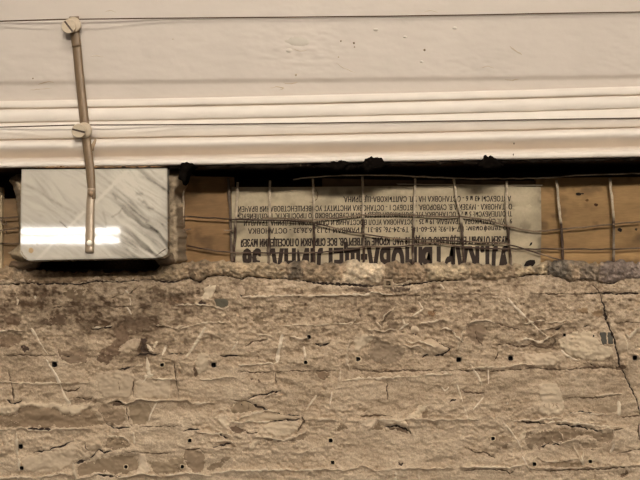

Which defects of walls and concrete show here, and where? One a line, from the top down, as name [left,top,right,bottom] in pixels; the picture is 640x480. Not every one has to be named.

spalling [178,162,198,186]
spalling [312,156,391,174]
spalling [8,242,42,270]
spalling [155,253,177,266]
crack [0,275,498,321]
crack [353,279,640,476]
spalling [215,400,263,433]
flaking render [249,421,308,452]